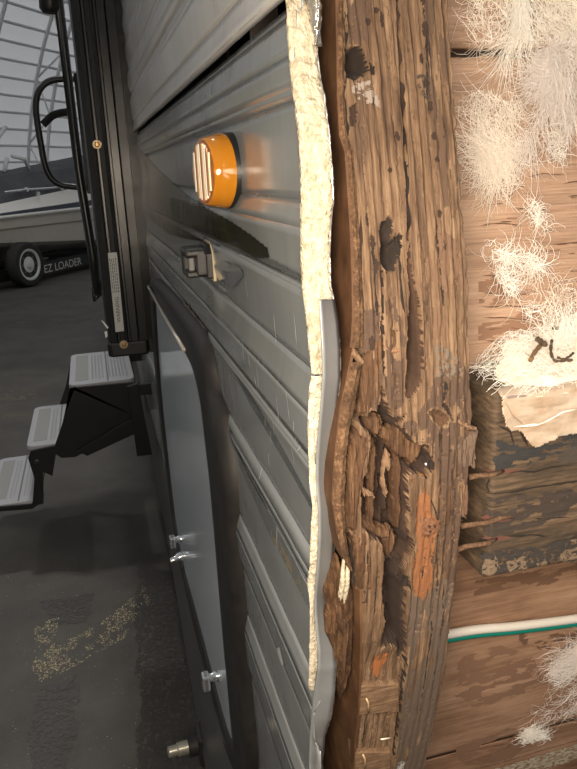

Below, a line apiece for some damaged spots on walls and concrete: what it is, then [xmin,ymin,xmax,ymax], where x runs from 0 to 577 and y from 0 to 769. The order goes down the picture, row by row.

hole [344,46,375,81]
spalling [365,213,424,399]
hole [429,403,454,426]
water stain [491,434,577,470]
spalling [357,386,435,769]
water stain [360,297,472,769]
rust [411,488,441,601]
peeling [482,555,547,576]
water stain [474,538,577,596]
water stain [483,488,577,538]
peeling [560,535,577,562]
water stain [454,631,577,707]